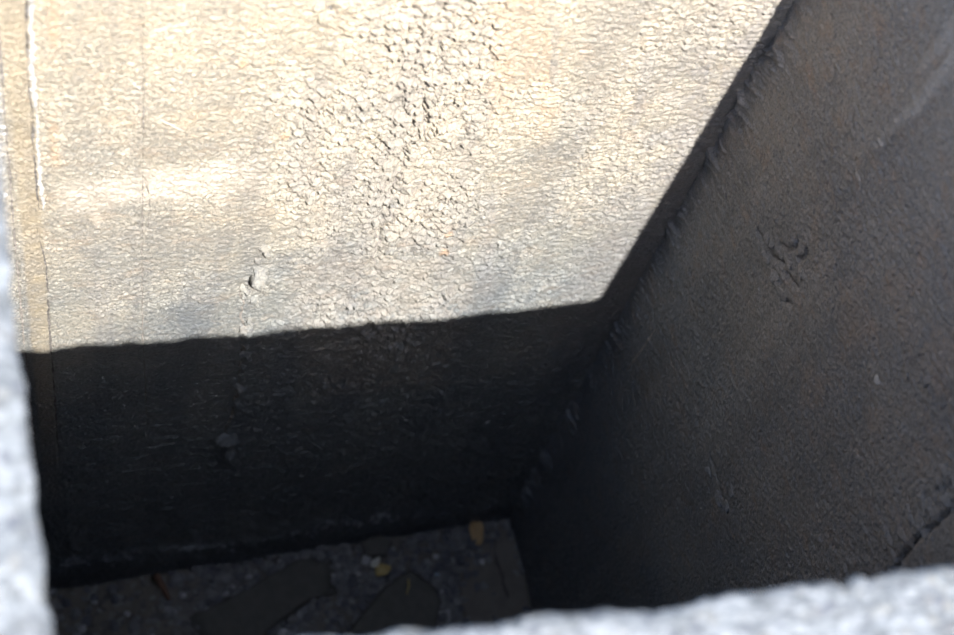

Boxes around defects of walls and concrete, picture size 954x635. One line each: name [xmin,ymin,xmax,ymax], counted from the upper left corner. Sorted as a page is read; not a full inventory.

crack [139,16,147,135]
crack [141,176,150,438]